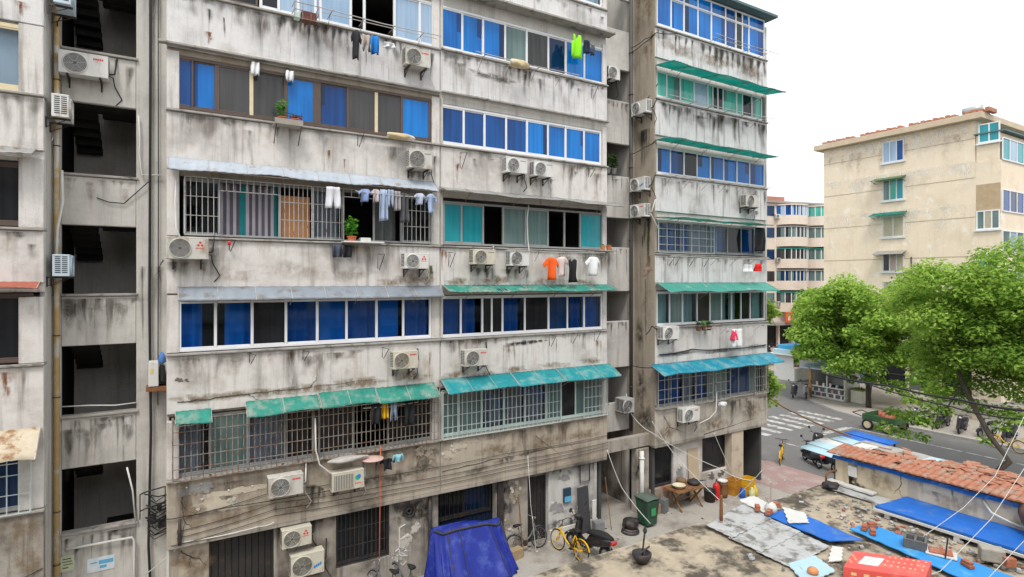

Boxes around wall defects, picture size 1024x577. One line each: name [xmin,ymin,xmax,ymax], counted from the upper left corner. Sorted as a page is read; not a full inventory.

water stain [645,30,765,76]
water stain [663,103,765,134]
peeling [175,481,267,513]